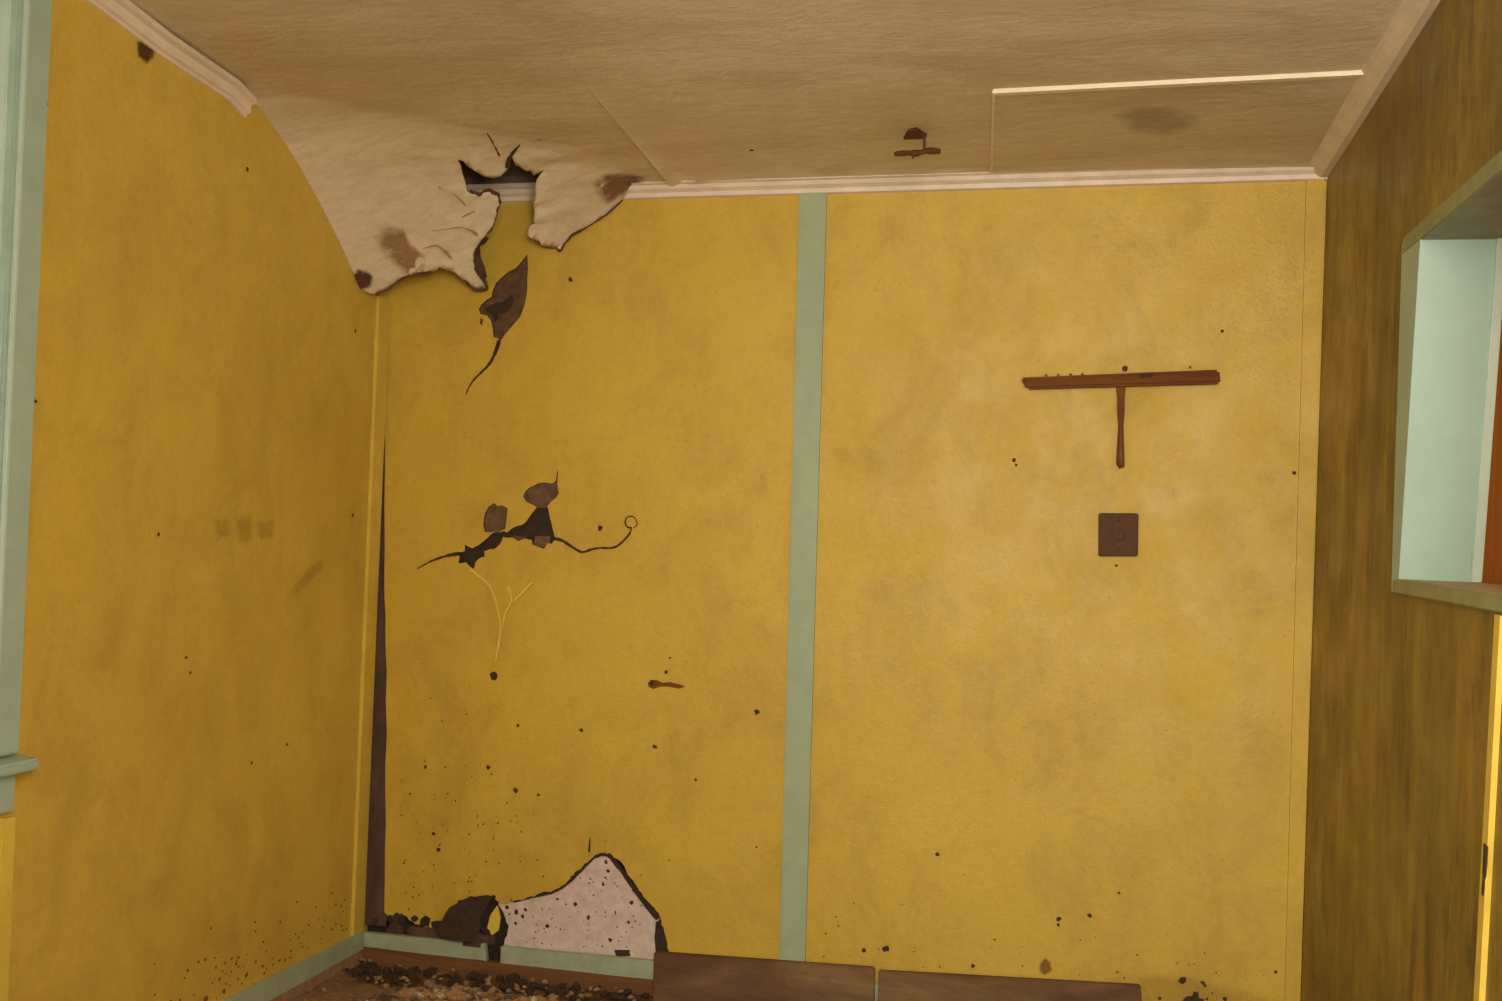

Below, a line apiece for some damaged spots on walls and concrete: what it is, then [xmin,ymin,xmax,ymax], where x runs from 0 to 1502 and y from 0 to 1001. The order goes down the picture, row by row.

spalling [459,157,542,185]
spalling [367,837,669,961]